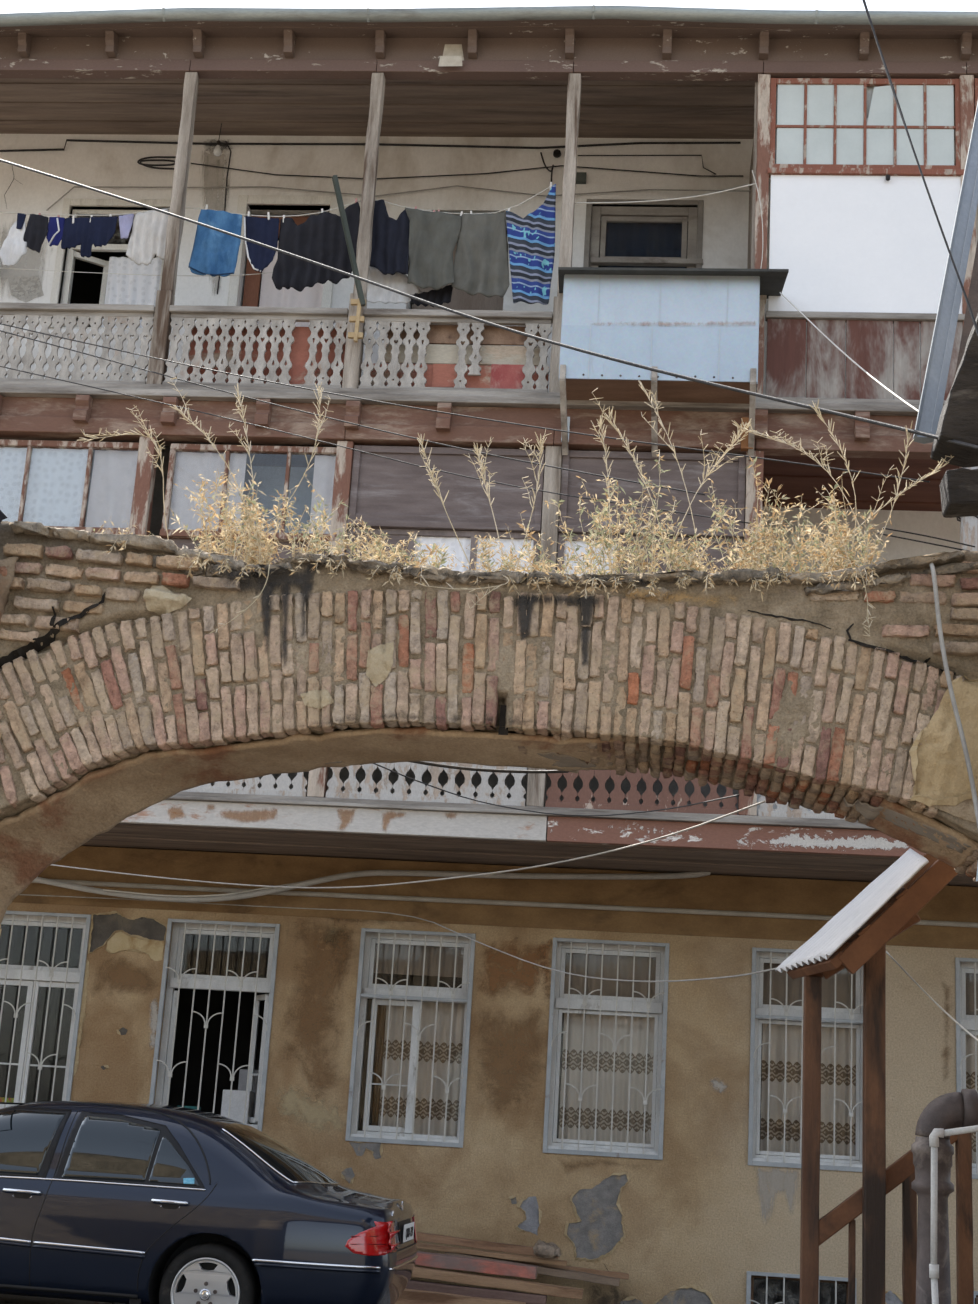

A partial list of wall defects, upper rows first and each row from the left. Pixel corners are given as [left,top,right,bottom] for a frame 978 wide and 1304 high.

crack [0,593,105,668]
water stain [218,559,325,663]
water stain [514,576,599,665]
peeling [738,833,908,852]
flaking render [73,911,167,1076]
flaking render [508,1195,542,1236]
flaking render [564,1171,630,1263]
flaking render [620,1284,715,1304]